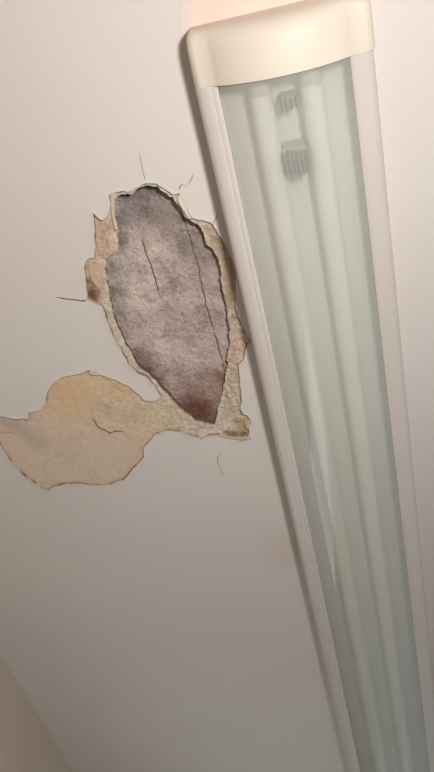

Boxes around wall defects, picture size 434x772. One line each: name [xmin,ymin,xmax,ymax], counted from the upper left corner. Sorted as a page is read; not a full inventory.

flaking render [0,183,252,490]